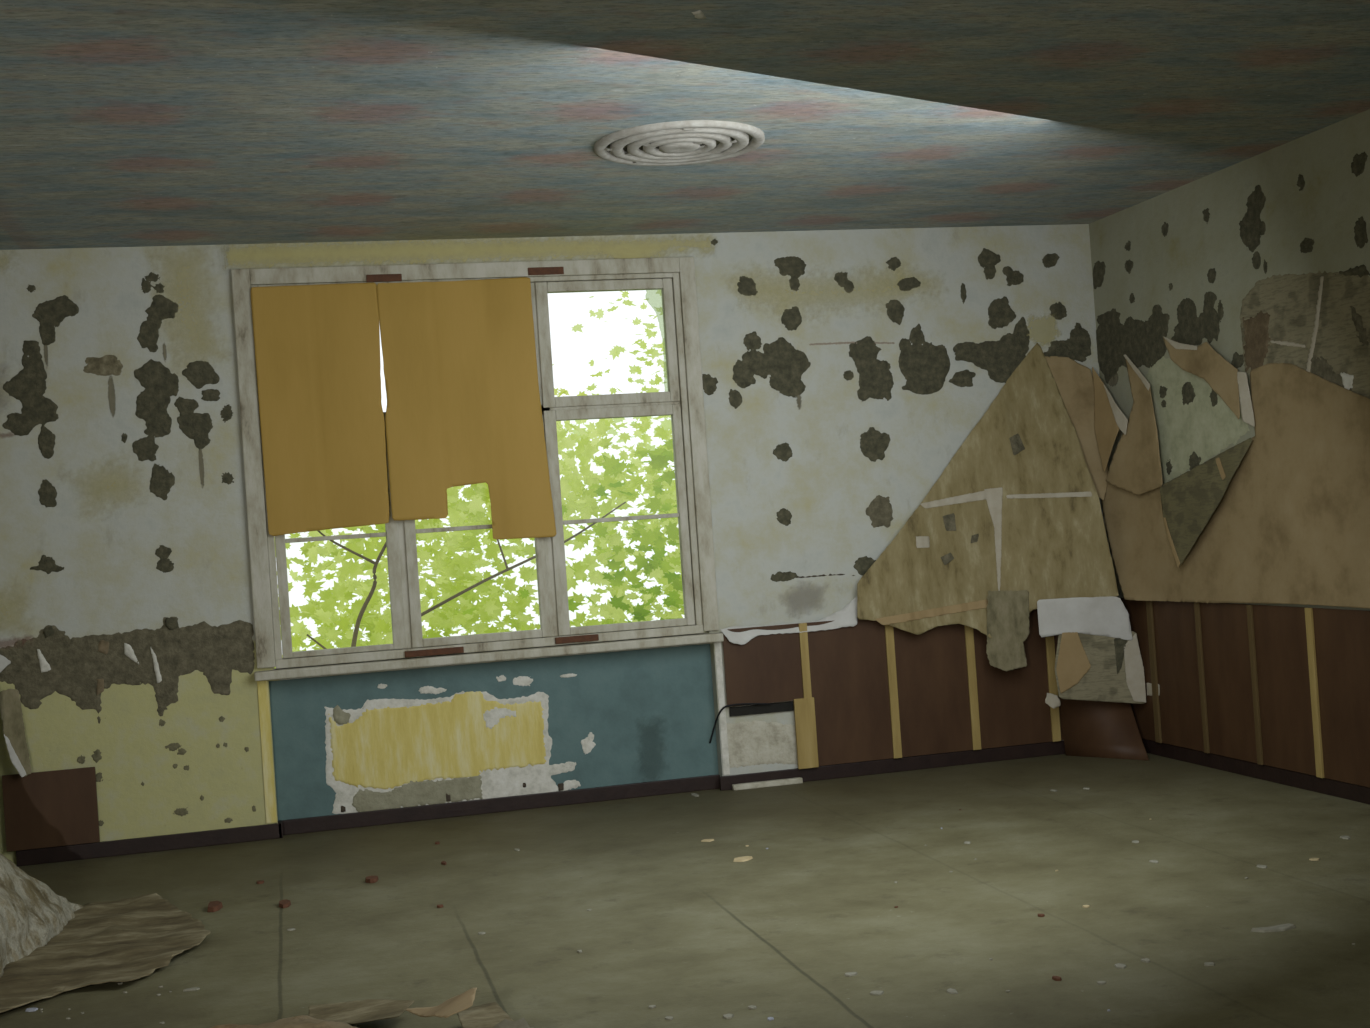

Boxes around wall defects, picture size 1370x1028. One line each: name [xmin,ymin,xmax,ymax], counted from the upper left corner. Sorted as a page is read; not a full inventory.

spalling [1239,185,1267,274]
spalling [2,284,79,459]
spalling [83,272,234,500]
peeling [843,248,1250,484]
peeling [1340,372,1354,390]
spalling [38,479,57,508]
spalling [866,495,894,528]
spalling [30,555,64,574]
spalling [155,545,174,573]
spalling [853,556,876,576]
spalling [0,617,255,726]
peeling [324,675,596,814]